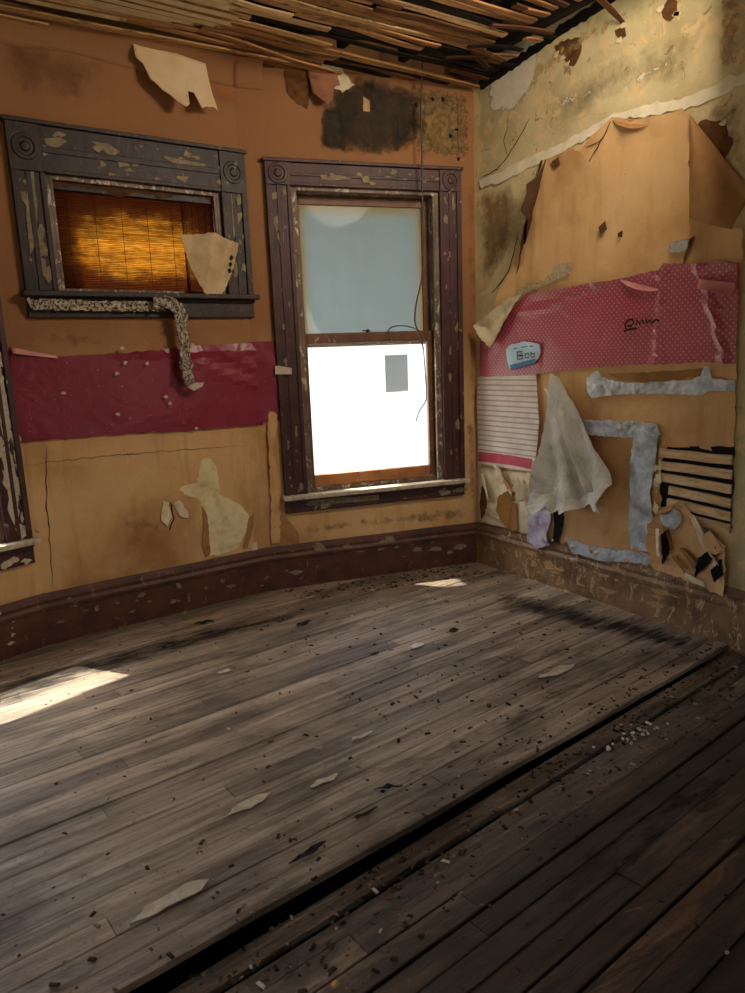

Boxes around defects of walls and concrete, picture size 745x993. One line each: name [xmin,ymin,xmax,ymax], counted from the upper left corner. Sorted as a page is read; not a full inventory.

flaking render [656,0,681,21]
peeling [133,44,237,110]
peeling [478,0,626,111]
peeling [42,131,67,156]
peeling [91,141,139,176]
peeling [156,148,221,185]
peeling [479,72,745,189]
peeling [19,171,52,283]
peeling [229,194,246,277]
peeling [0,352,27,539]
flaking render [161,458,258,557]
peeling [1,556,31,570]